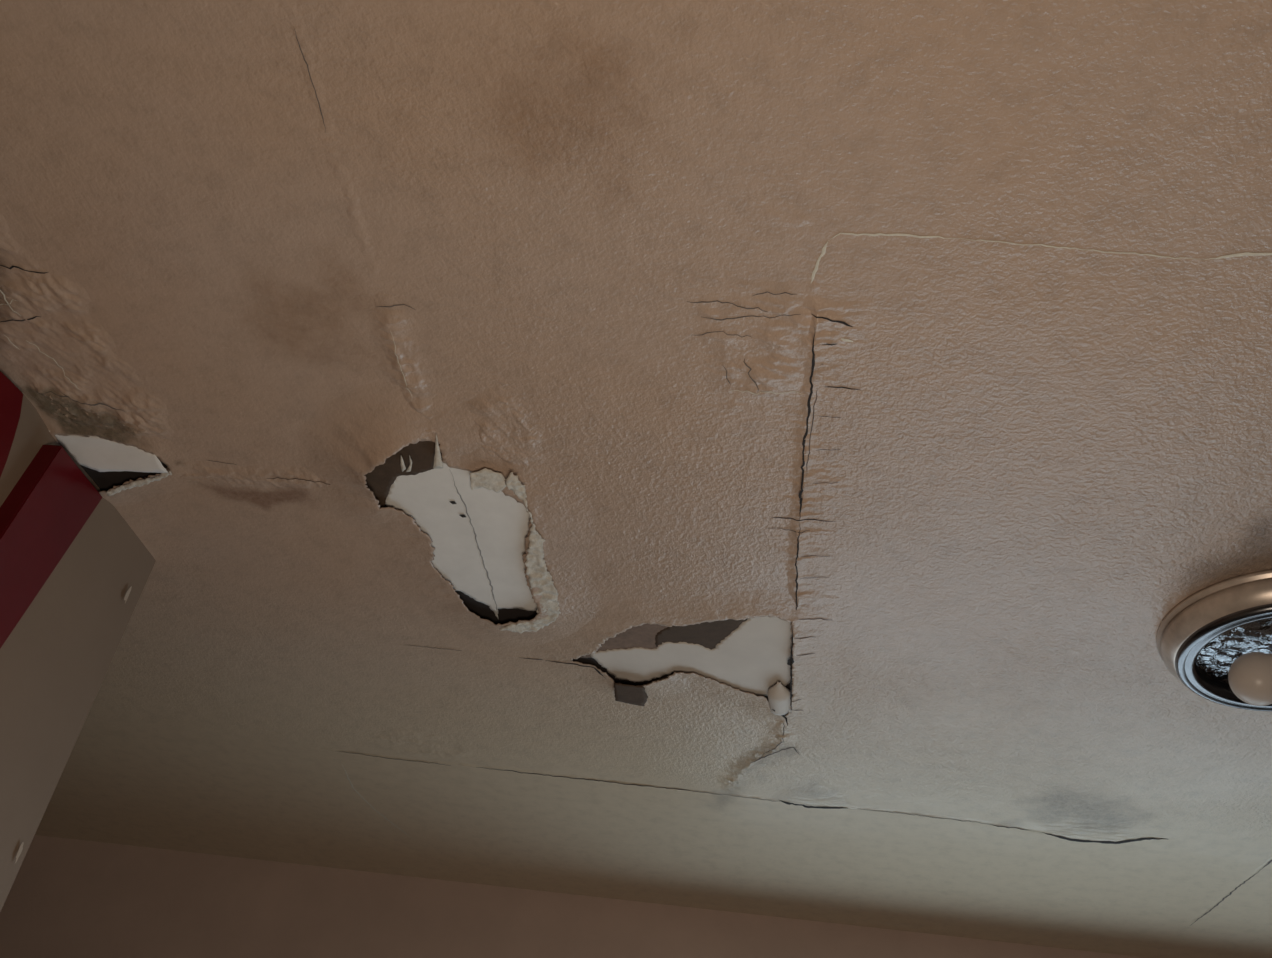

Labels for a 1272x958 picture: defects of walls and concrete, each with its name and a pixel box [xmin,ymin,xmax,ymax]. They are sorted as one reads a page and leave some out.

flaking render [36,408,199,506]
flaking render [297,382,839,728]
crack [757,233,1272,610]
crack [321,713,1170,844]